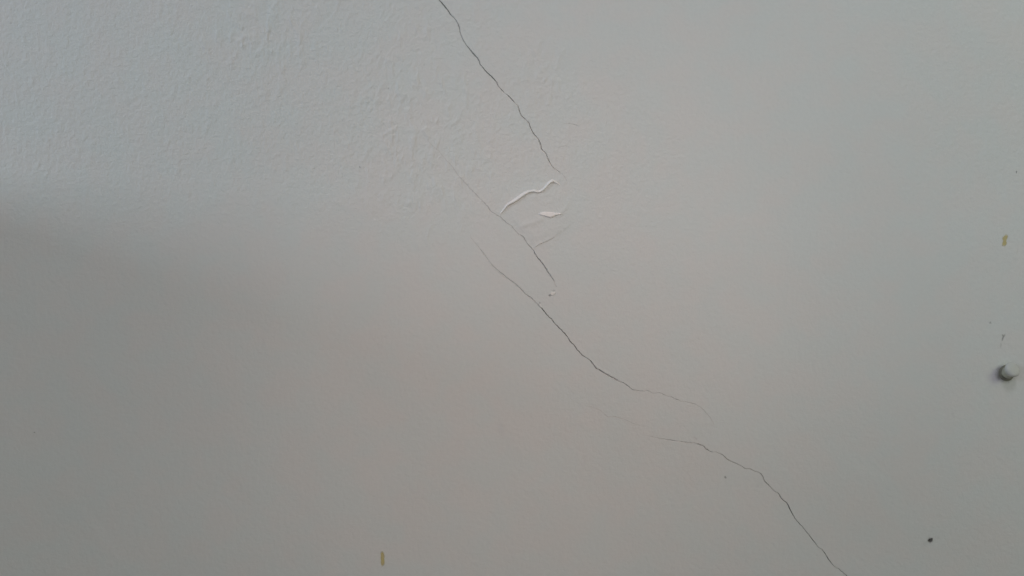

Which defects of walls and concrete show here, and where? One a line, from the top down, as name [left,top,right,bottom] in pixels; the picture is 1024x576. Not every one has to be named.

crack [439,0,567,180]
crack [427,140,557,287]
crack [470,237,847,576]